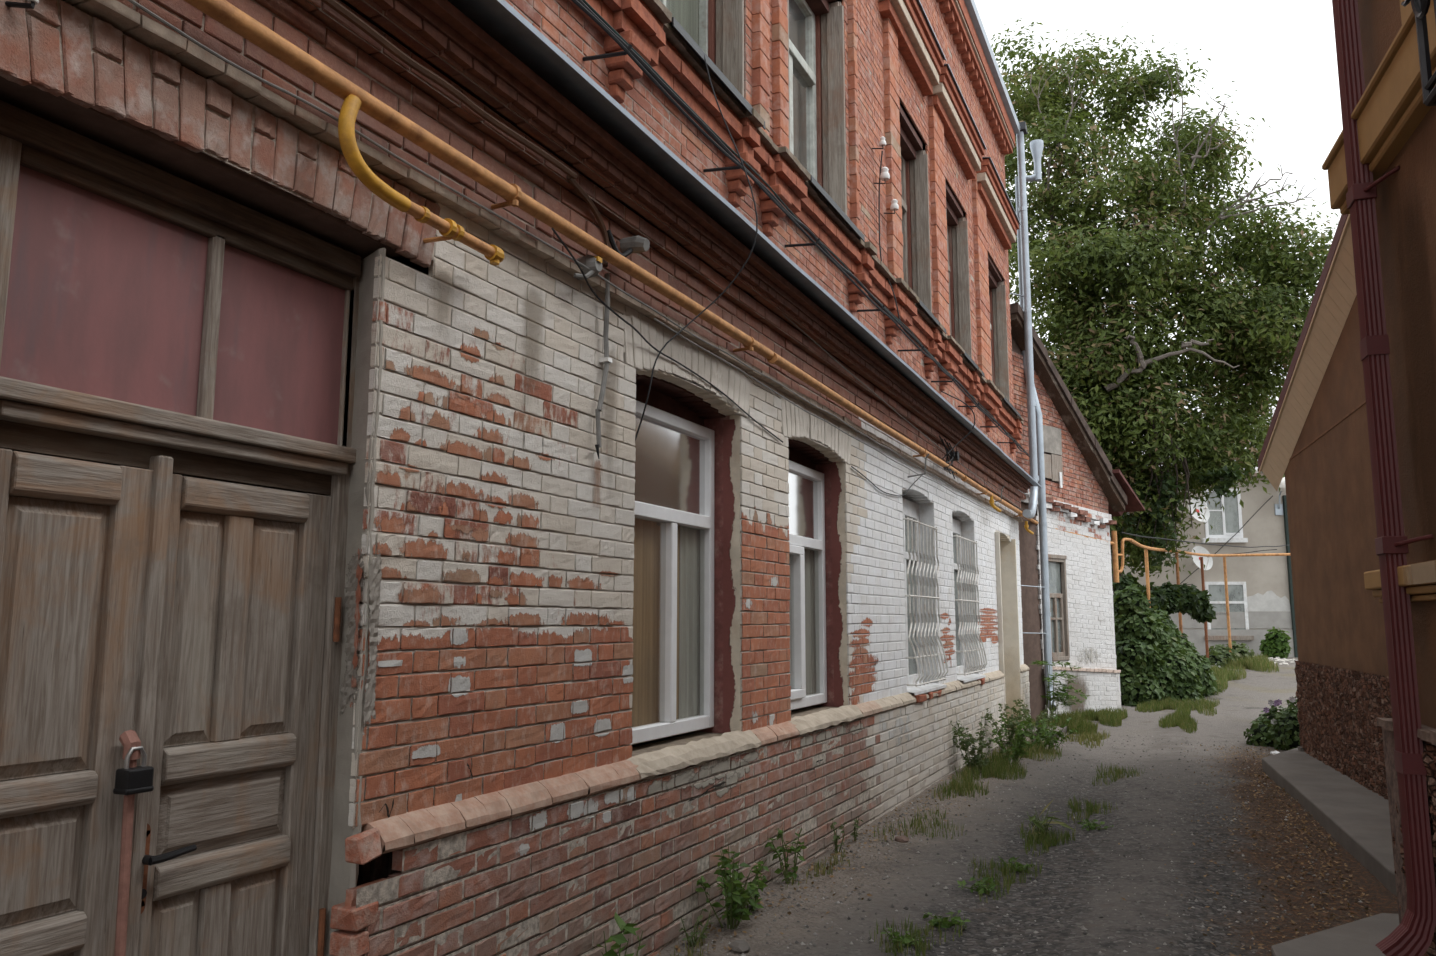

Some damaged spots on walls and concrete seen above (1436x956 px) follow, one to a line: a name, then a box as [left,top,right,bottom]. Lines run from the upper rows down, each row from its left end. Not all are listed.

peeling [459,327,505,363]
peeling [340,360,633,886]
peeling [741,506,791,731]
peeling [849,617,879,705]
peeling [978,608,998,644]
spalling [329,901,379,956]